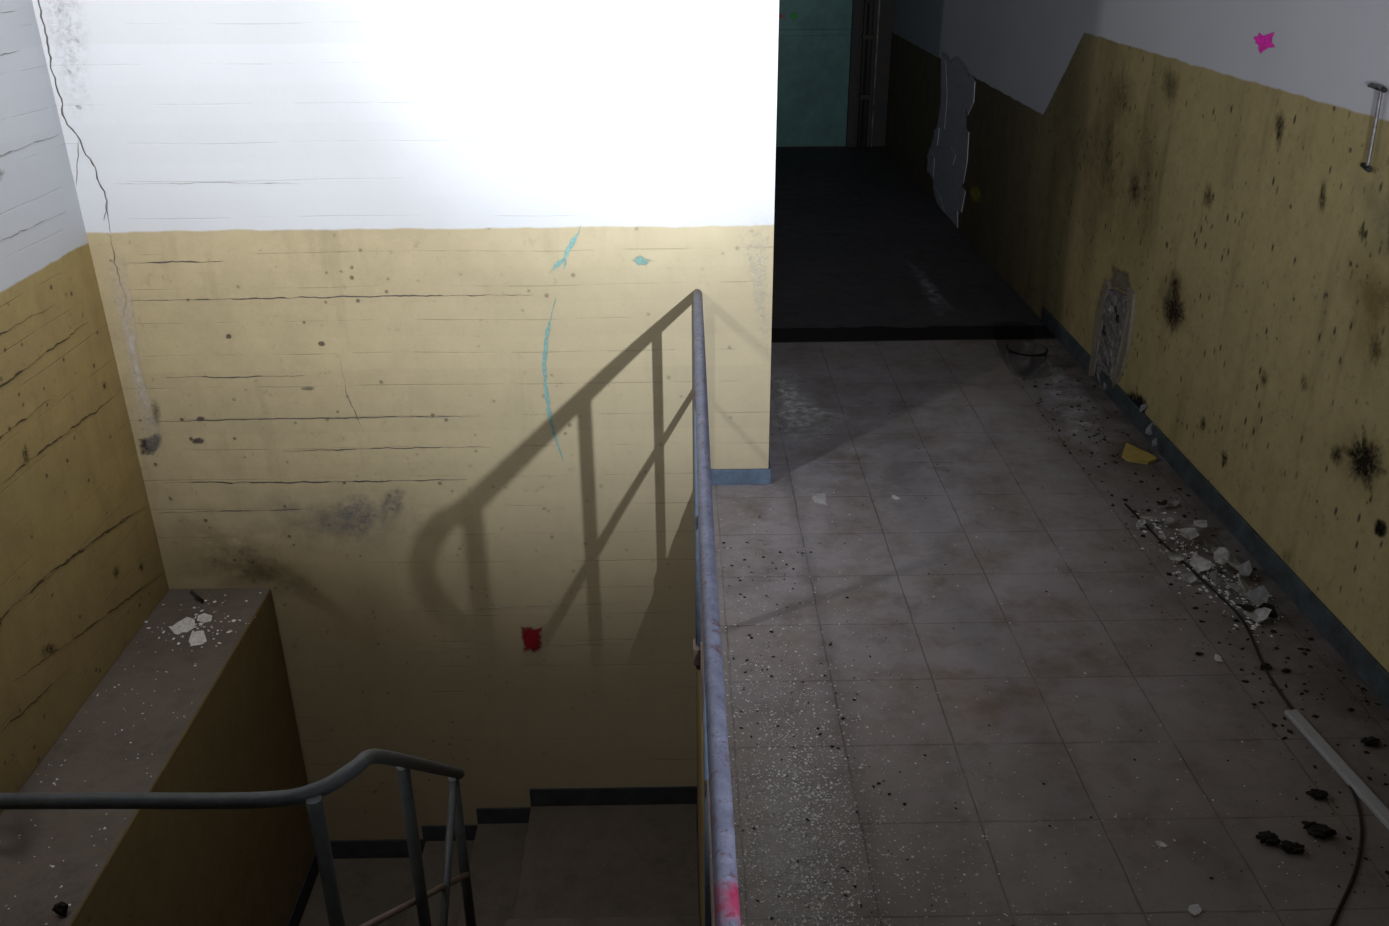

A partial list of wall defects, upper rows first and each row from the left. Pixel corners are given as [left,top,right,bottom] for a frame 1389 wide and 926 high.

crack [0,0,528,316]
peeling [927,53,975,228]
crack [0,322,88,387]
spalling [1088,267,1158,447]
leakage [1166,279,1182,329]
crack [0,363,474,620]
leakage [1332,437,1378,484]